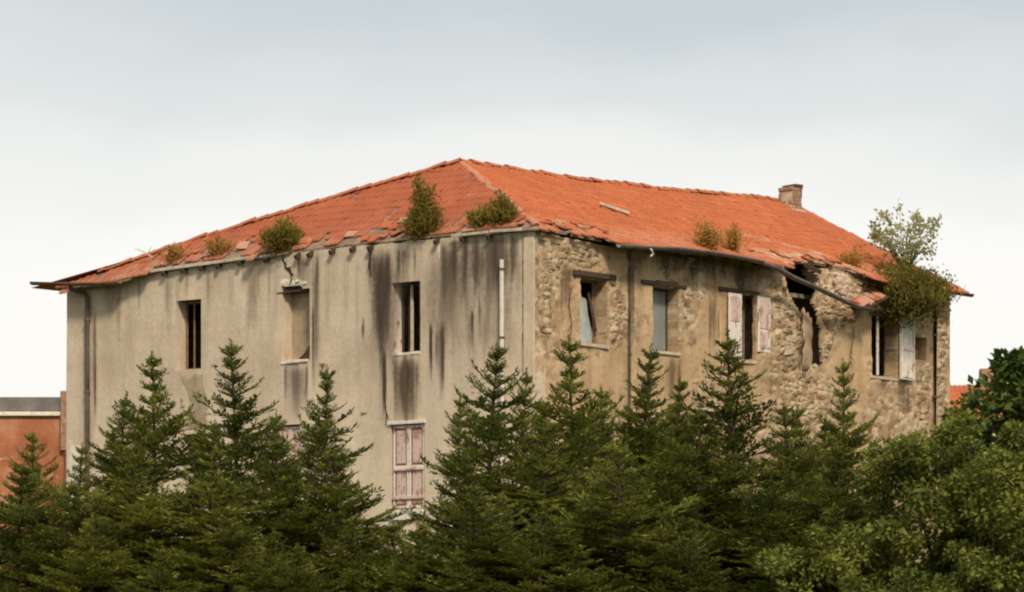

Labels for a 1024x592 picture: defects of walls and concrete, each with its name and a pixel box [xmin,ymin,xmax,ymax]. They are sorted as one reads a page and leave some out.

water stain [285,368,307,394]
water stain [312,261,329,350]
water stain [369,251,415,405]
water stain [429,326,444,376]
flaking render [538,233,601,338]
flaking render [768,273,836,450]
flaking render [829,272,859,323]
flaking render [915,313,949,436]